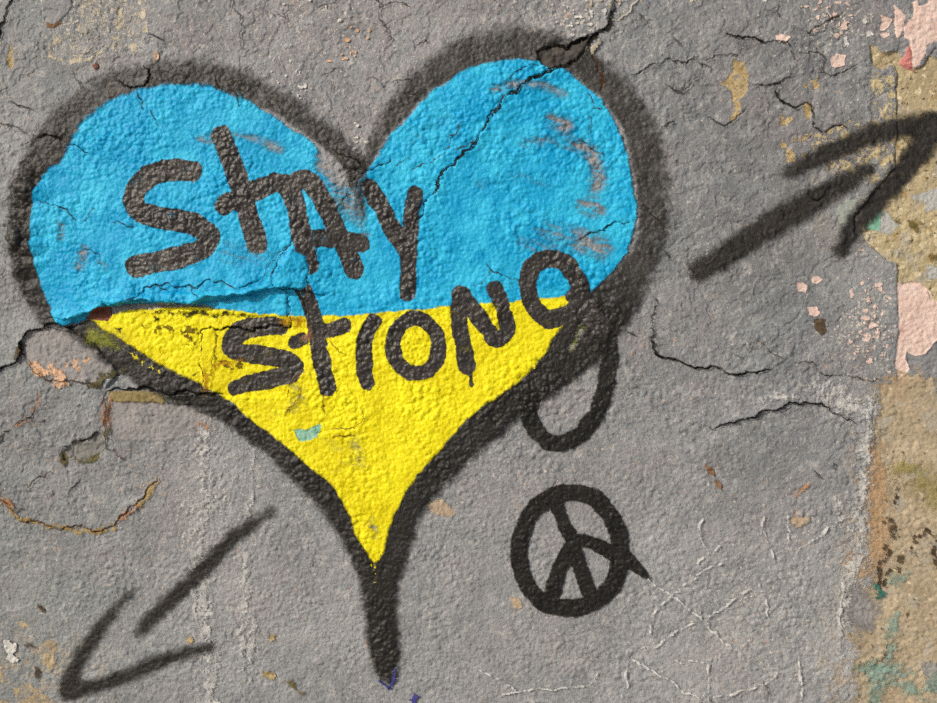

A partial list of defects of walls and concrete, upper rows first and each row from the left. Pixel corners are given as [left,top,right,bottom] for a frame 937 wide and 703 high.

peeling [780,0,937,163]
peeling [823,135,912,184]
crack [0,0,879,532]
peeling [797,276,822,293]
peeling [807,306,827,336]
spalling [22,327,121,383]
peeling [835,143,937,703]